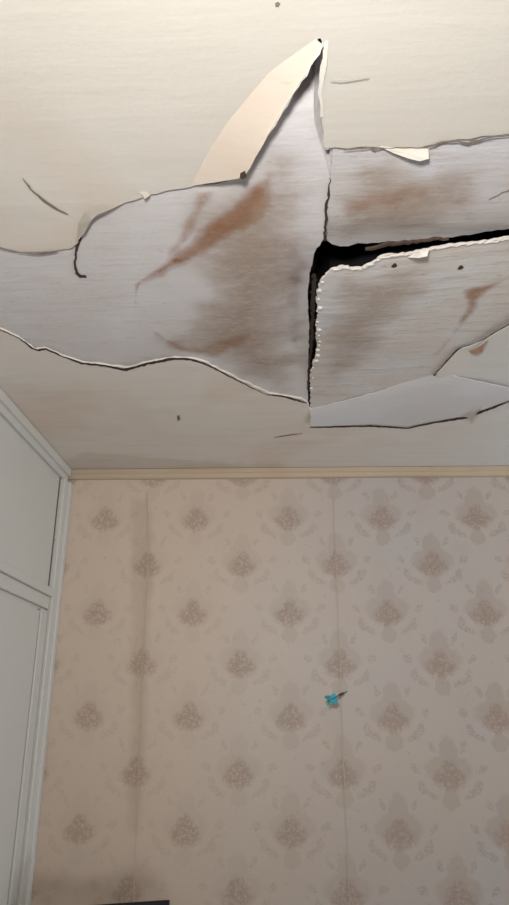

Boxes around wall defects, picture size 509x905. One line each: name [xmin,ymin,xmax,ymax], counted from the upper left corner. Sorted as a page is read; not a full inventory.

flaking render [0,38,509,401]
crack [0,178,509,403]
crack [343,134,509,151]